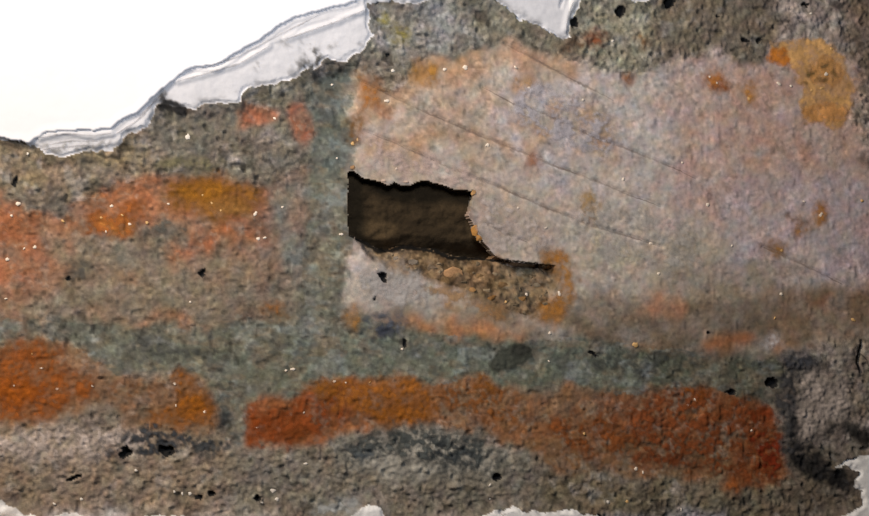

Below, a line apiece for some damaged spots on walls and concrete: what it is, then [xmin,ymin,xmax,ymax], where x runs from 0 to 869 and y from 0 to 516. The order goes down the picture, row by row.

flaking render [0,0,869,219]
corrosion [767,38,854,127]
corrosion [87,201,144,237]
corrosion [167,178,259,220]
spalling [347,165,560,322]
corrosion [0,340,92,419]
corrosion [248,375,517,444]
flaking render [0,336,869,516]
corrosion [549,388,781,489]